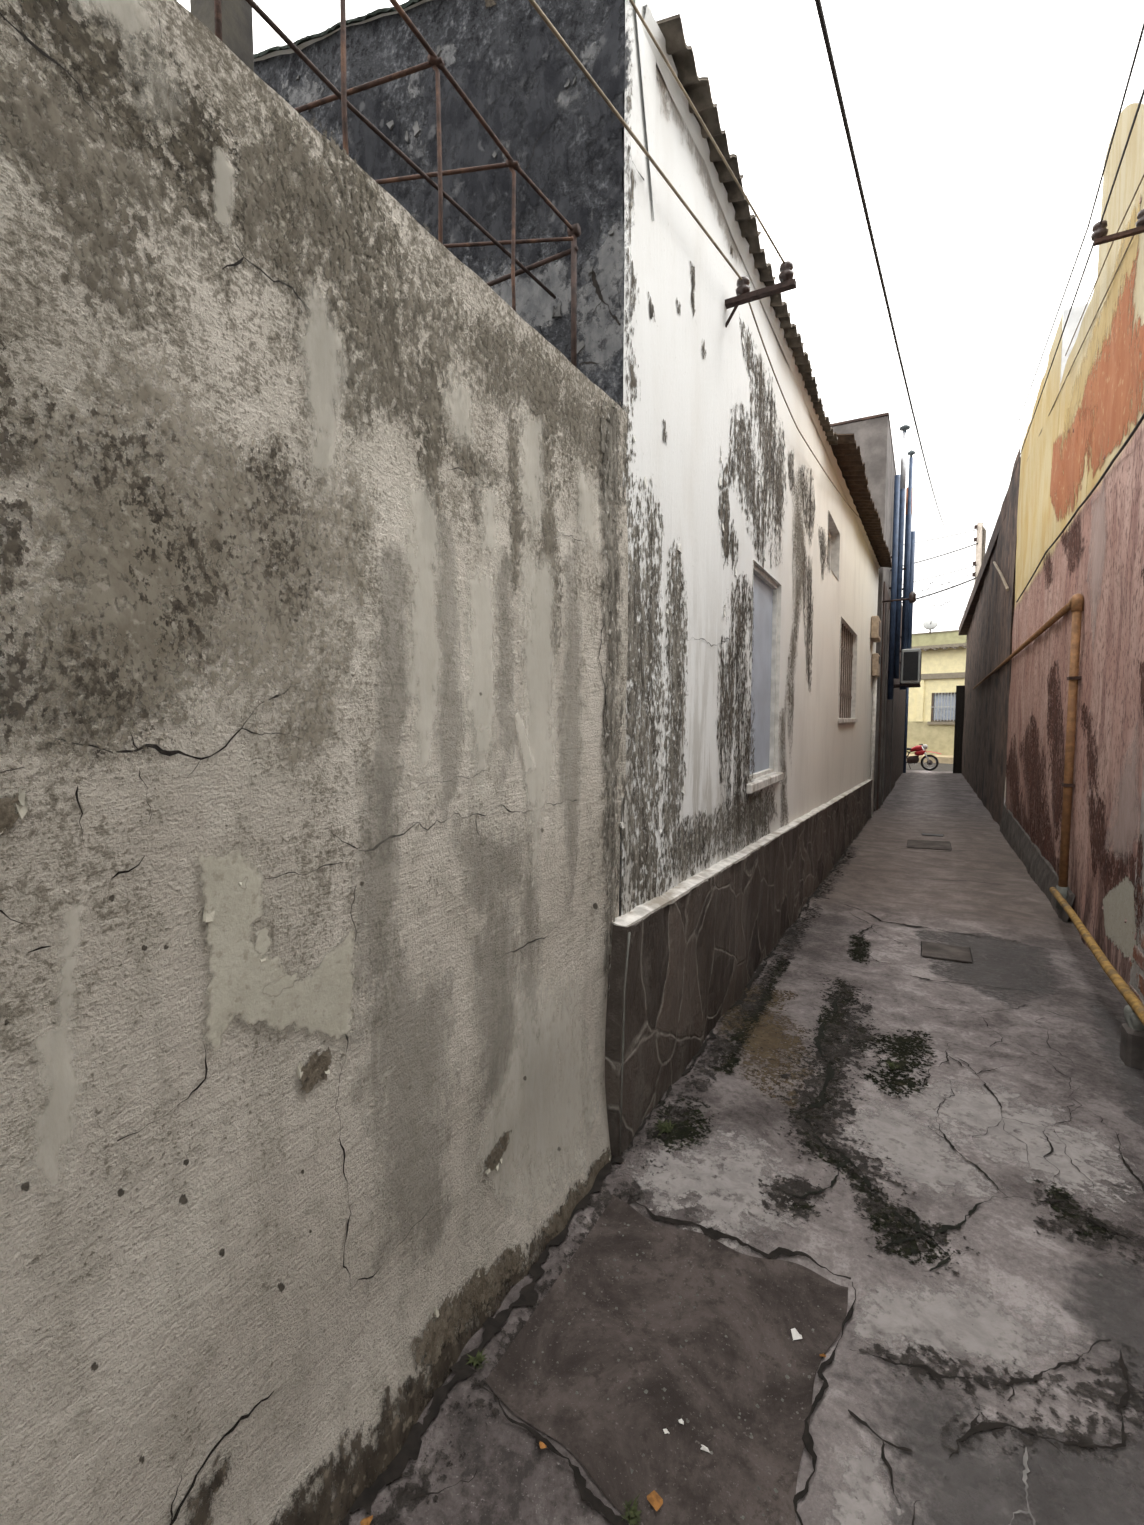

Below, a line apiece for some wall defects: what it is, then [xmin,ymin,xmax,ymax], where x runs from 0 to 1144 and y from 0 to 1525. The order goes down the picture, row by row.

water stain [0,0,641,783]
peeling [1044,197,1144,590]
crack [56,672,322,880]
crack [266,770,577,942]
water stain [751,468,806,837]
water stain [271,845,1144,1525]
crack [335,816,1144,1525]
water stain [185,1455,231,1525]
crack [170,1391,274,1525]